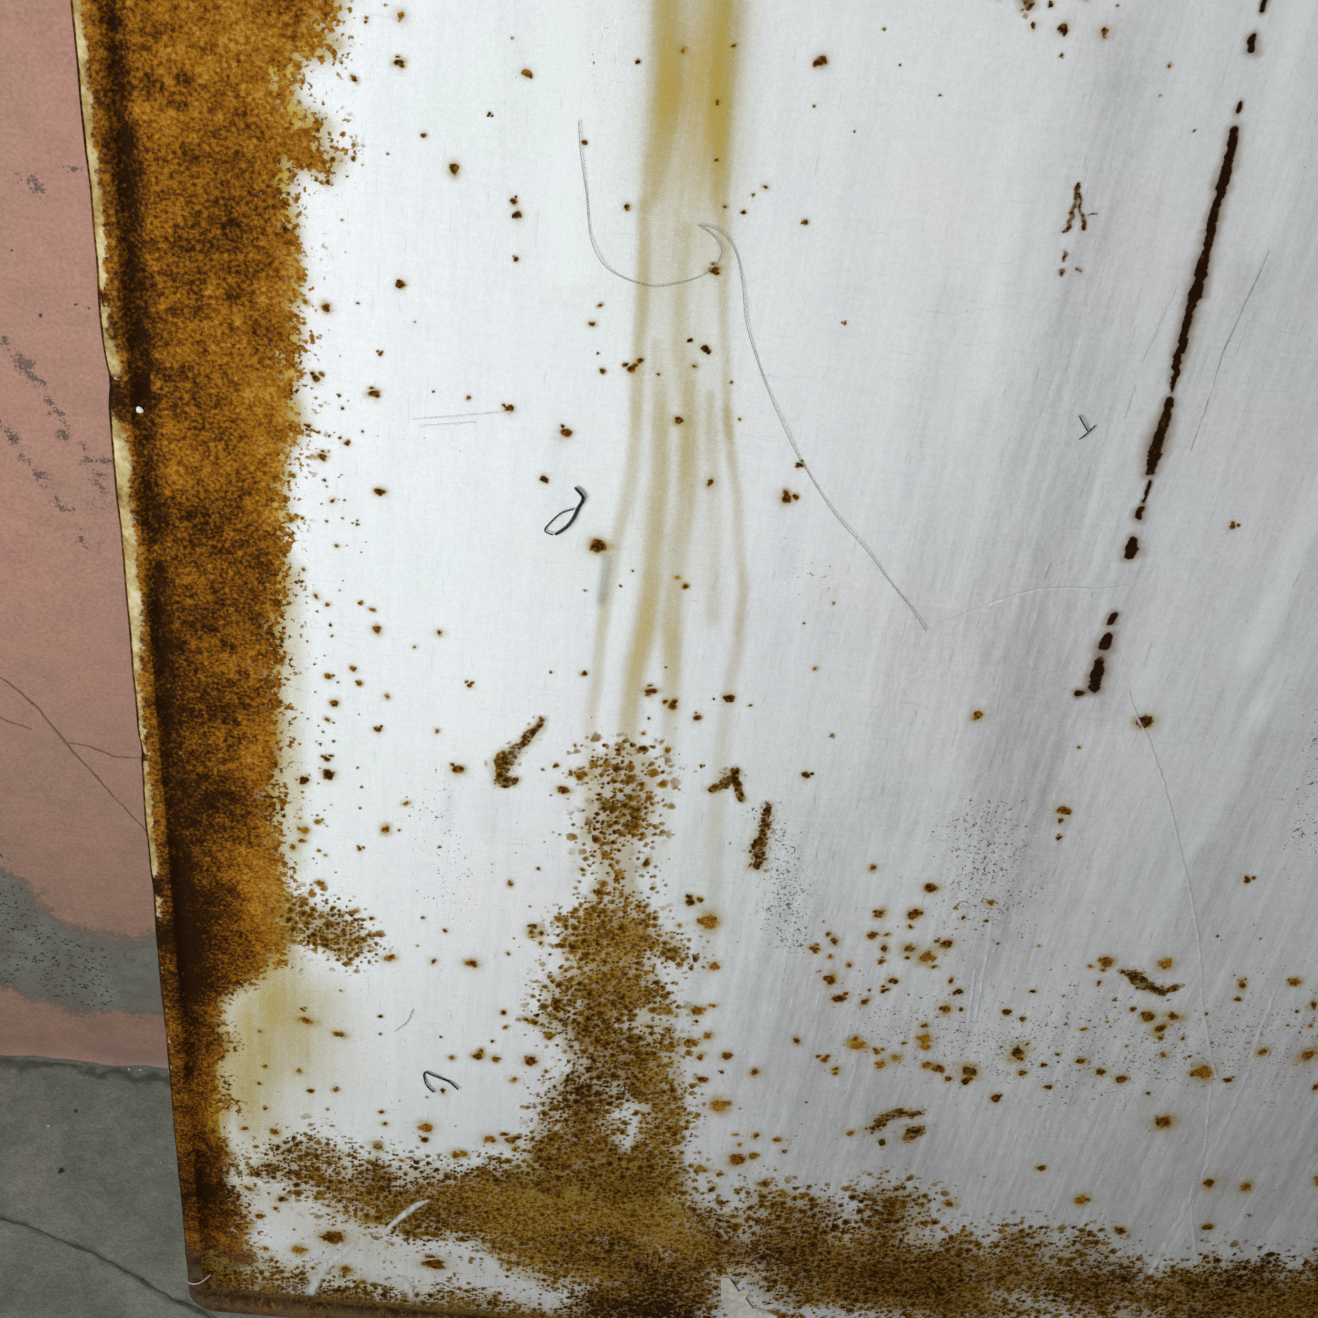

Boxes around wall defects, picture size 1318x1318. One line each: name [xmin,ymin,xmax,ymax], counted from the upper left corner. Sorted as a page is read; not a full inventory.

corrosion [1062,182,1097,233]
corrosion [589,538,608,553]
corrosion [644,684,677,710]
corrosion [320,754,335,781]
corrosion [493,717,545,788]
corrosion [707,767,745,803]
corrosion [748,802,772,870]
corrosion [866,909,953,969]
corrosion [809,932,899,1005]
corrosion [1087,957,1181,996]
corrosion [849,1023,977,1085]
corrosion [846,1108,926,1146]